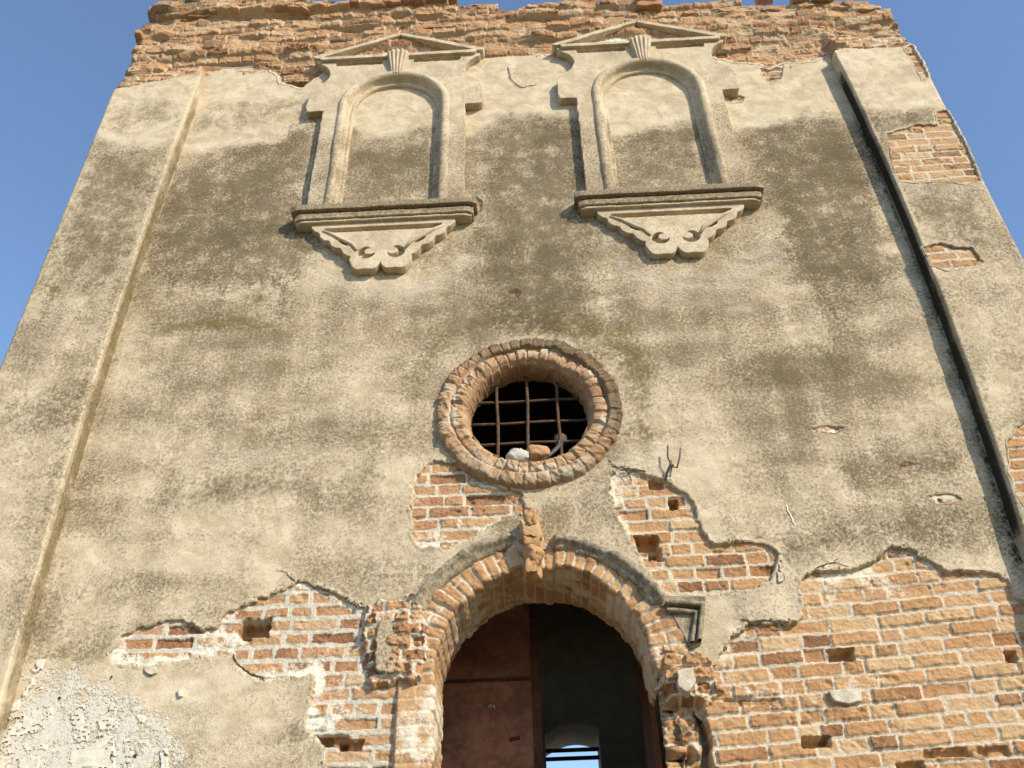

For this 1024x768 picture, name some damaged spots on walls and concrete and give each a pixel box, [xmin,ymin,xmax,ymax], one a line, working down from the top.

damp [42,154,149,312]
damp [147,124,316,313]
damp [468,112,598,335]
damp [715,72,1023,568]
flaking render [885,109,983,186]
flaking render [920,241,986,272]
damp [411,533,516,611]
flaking render [405,457,530,554]
damp [550,533,666,608]
flaking render [604,463,784,598]
flaking render [104,578,397,768]
flaking render [697,542,1024,768]